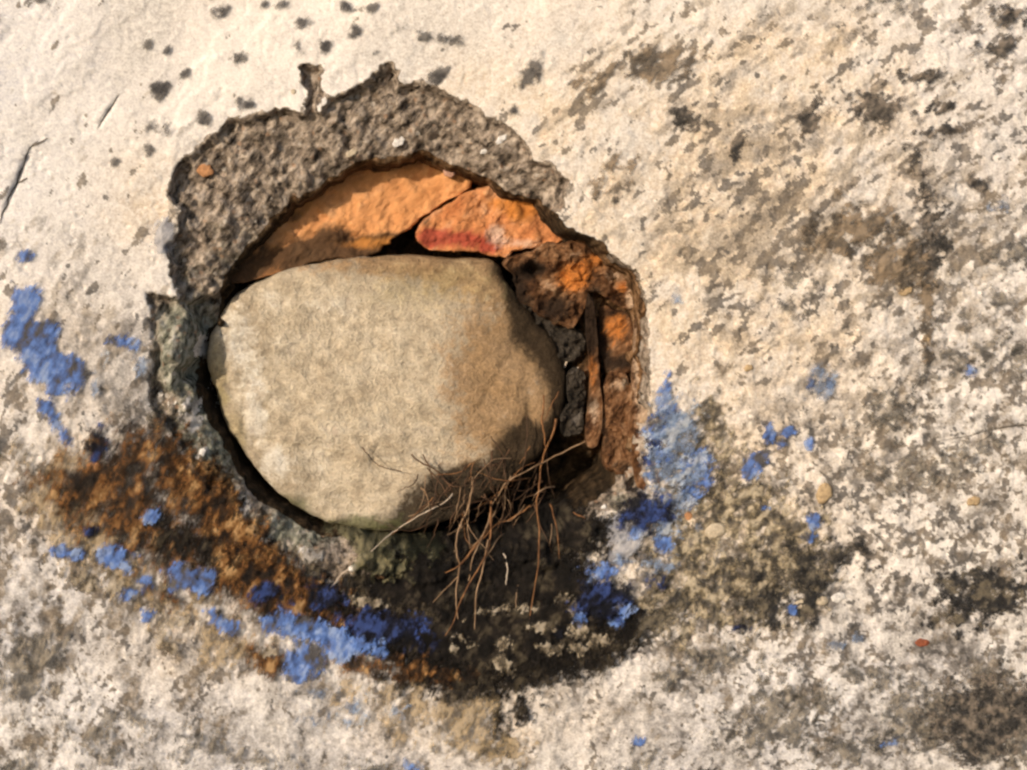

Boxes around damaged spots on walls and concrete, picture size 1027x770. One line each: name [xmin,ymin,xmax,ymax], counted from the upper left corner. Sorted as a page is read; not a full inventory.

peeling [16,248,35,263]
peeling [1,285,110,463]
spalling [101,61,718,699]
water stain [1,746,37,770]
water stain [0,616,82,728]
water stain [0,436,253,672]
peeling [49,526,241,657]
water stain [52,699,305,770]
corrosion [15,417,359,681]
corrosion [324,654,477,685]
water stain [186,453,1027,770]
peeling [799,513,820,544]